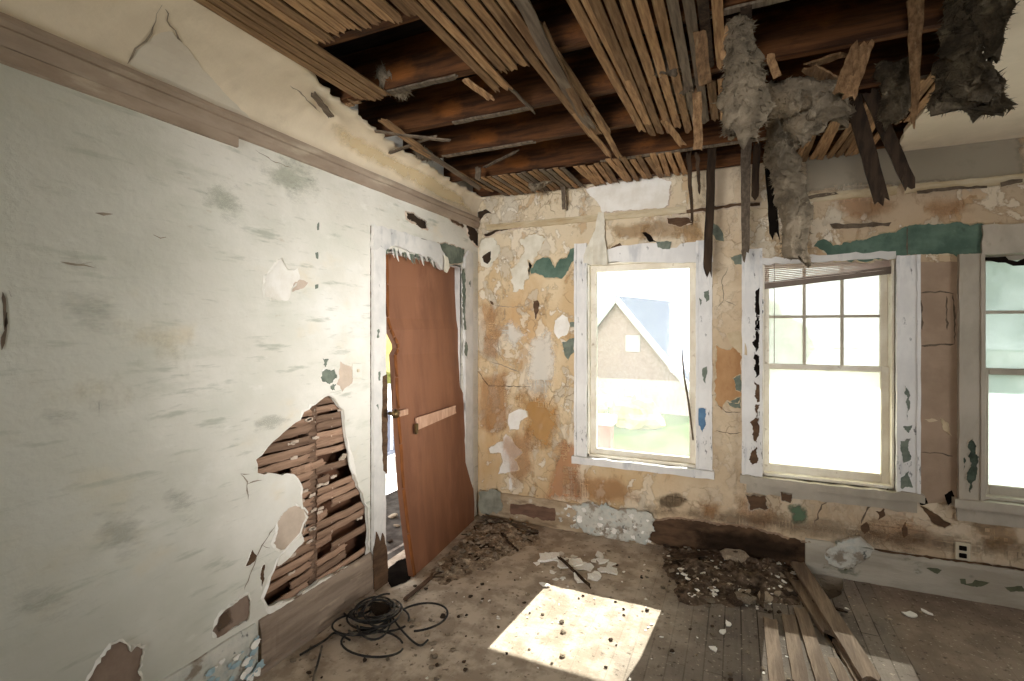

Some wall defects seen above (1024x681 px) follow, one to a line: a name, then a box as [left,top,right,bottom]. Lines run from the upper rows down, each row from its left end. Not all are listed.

crack [128,7,182,63]
peeling [262,258,318,301]
peeling [437,177,762,360]
spalling [212,358,370,638]
peeling [478,408,812,546]
peeling [698,287,765,467]
spalling [900,386,914,489]
peeling [85,638,146,681]